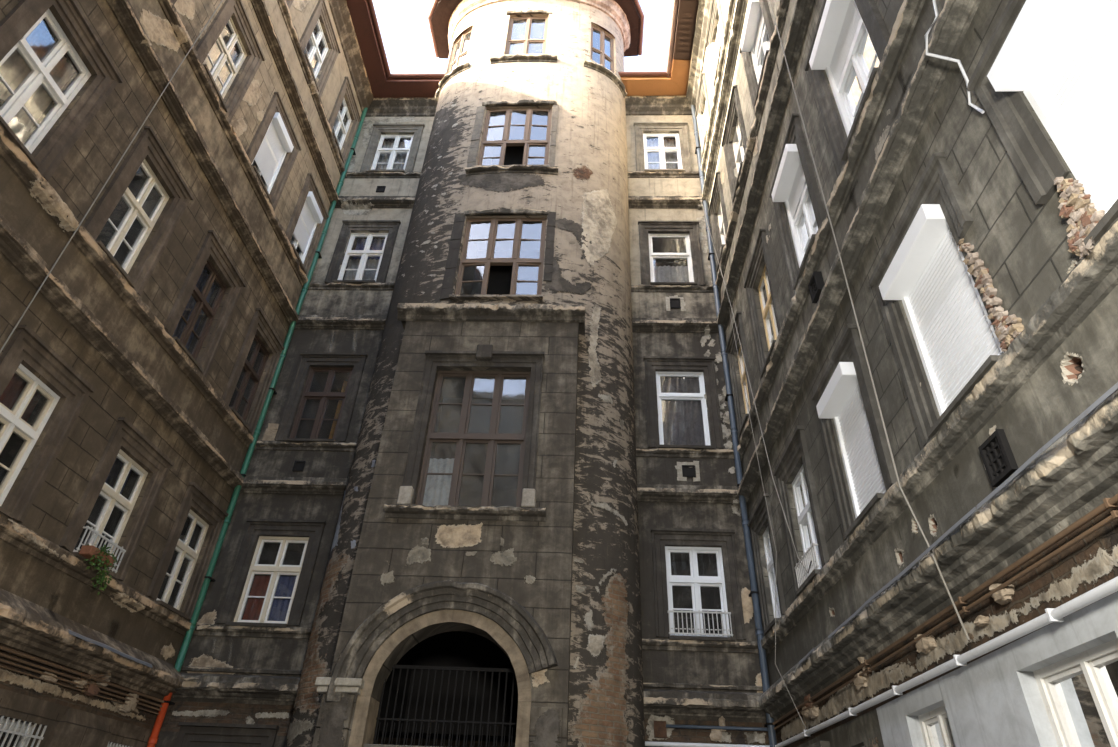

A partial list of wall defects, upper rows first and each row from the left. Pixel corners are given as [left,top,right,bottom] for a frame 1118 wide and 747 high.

spalling [580,189,617,267]
spalling [1054,177,1105,282]
spalling [543,257,613,404]
peeling [665,295,686,311]
spalling [958,238,1025,352]
hole [1051,337,1095,399]
peeling [675,461,700,482]
spalling [7,518,70,563]
spalling [380,522,517,585]
spalling [892,507,944,574]
spalling [781,544,1118,741]
spalling [0,668,146,721]